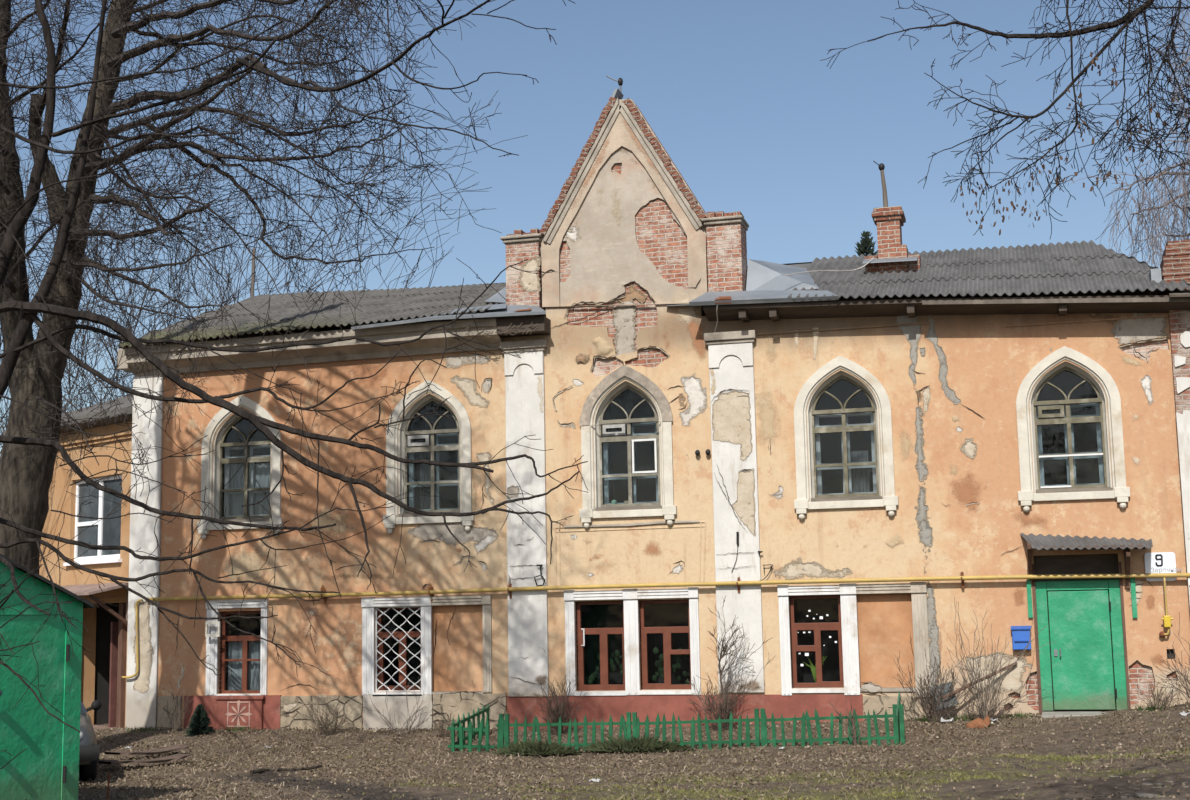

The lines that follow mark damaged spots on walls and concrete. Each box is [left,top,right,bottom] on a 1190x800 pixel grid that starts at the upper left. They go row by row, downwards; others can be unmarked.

spalling [635,198,688,289]
peeling [519,256,541,292]
spalling [567,282,668,386]
peeling [1111,313,1169,405]
peeling [450,375,491,407]
peeling [678,370,715,426]
peeling [472,452,519,510]
peeling [407,522,499,570]
peeling [773,557,853,580]
spalling [1124,657,1180,707]